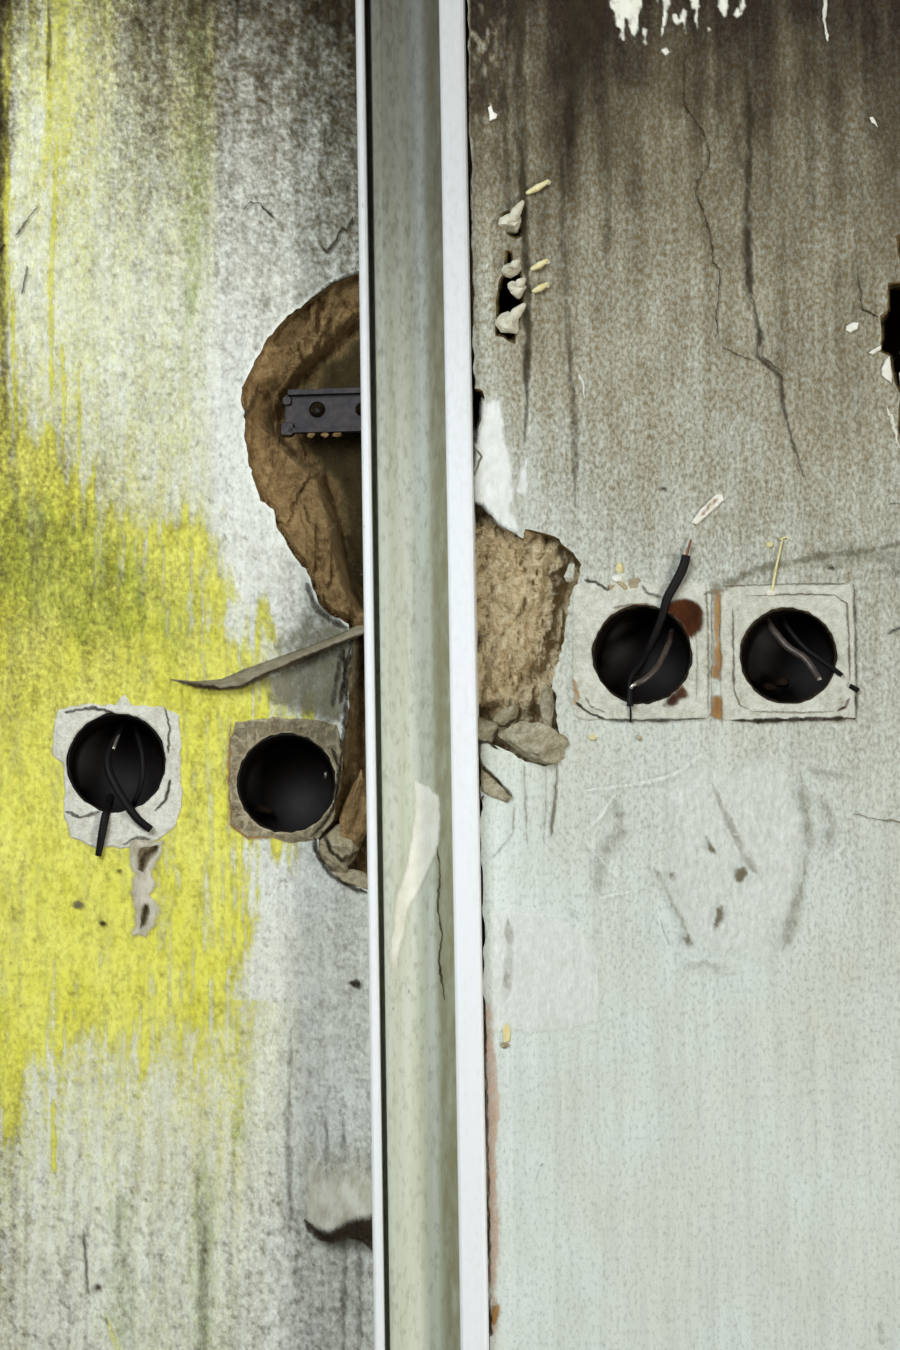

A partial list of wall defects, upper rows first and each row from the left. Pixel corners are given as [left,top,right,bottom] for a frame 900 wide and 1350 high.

peeling [610,0,710,55]
peeling [718,0,745,17]
spalling [497,257,525,344]
leakage [503,0,532,437]
crack [682,38,804,477]
leakage [744,92,753,299]
peeling [869,345,900,384]
peeling [0,0,368,1173]
spalling [474,400,659,803]
corrosion [668,590,722,679]
corrosion [664,685,687,706]
corrosion [711,696,722,720]